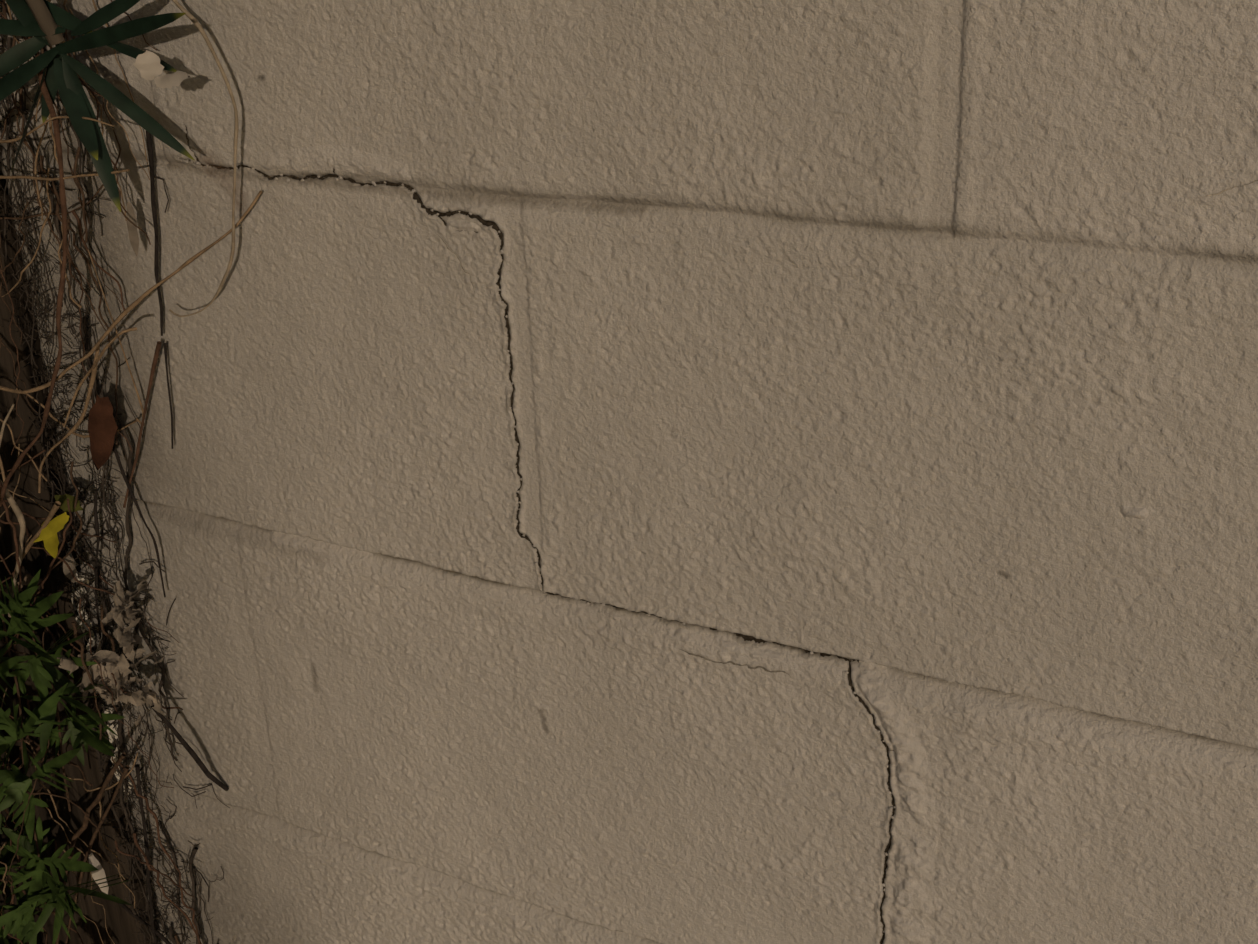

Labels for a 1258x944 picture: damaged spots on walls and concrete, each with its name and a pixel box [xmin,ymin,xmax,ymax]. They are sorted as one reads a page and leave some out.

crack [178,125,896,944]